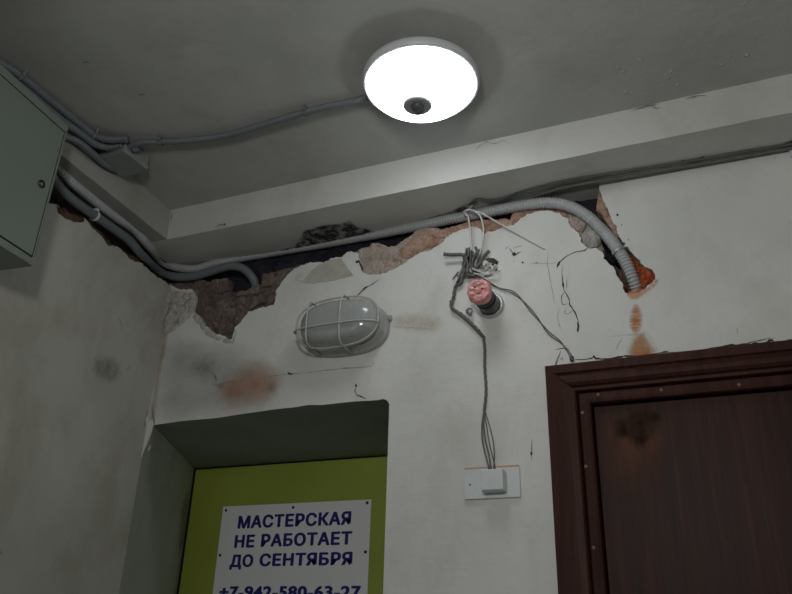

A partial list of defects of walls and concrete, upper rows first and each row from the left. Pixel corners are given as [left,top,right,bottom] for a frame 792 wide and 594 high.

spalling [355,208,606,277]
spalling [596,190,629,242]
spalling [168,258,353,344]
crack [532,248,587,332]
corrosion [631,308,649,355]